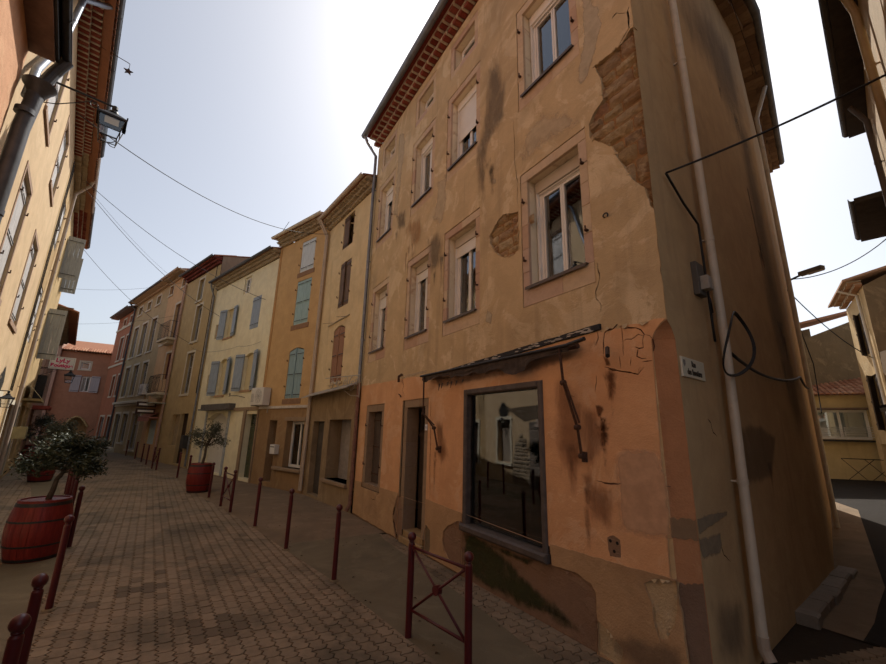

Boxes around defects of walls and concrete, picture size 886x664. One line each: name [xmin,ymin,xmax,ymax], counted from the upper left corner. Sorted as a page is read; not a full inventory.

flaking render [590,30,654,208]
flaking render [489,213,535,258]
crack [595,324,655,389]